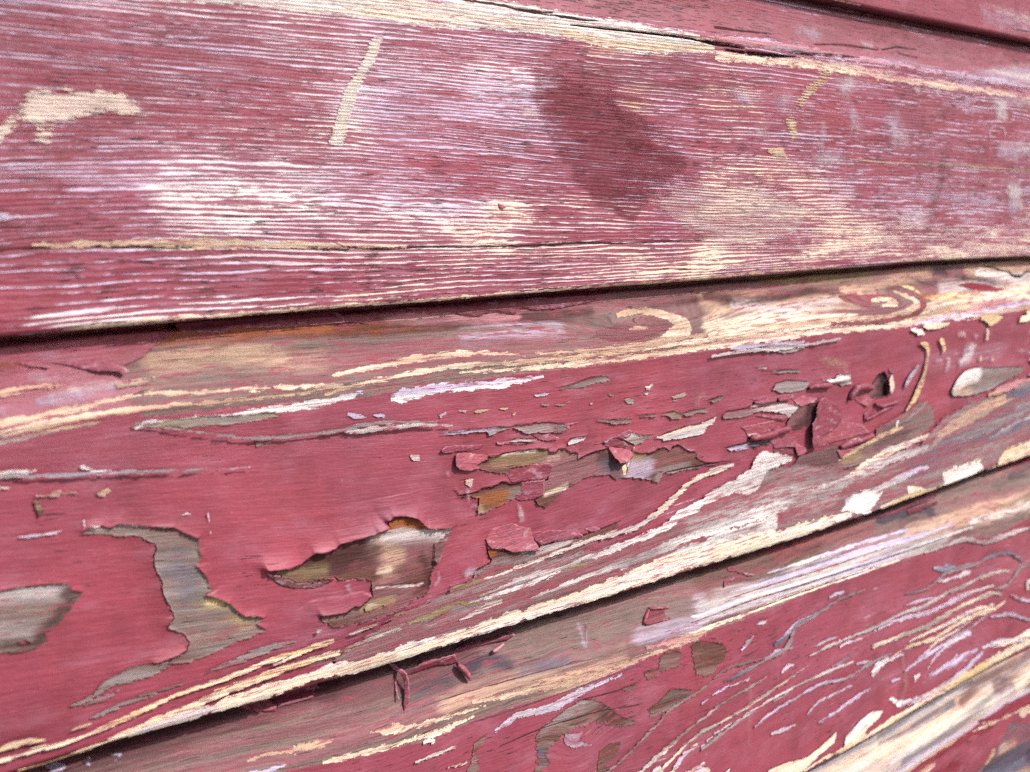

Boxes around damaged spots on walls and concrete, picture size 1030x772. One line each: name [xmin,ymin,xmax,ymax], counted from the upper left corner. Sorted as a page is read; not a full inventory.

crack [464,0,917,59]
peeling [911,322,950,335]
peeling [952,355,1025,396]
peeling [439,367,898,515]
peeling [852,491,939,521]
peeling [267,517,453,627]
peeling [0,583,83,653]
peeling [70,524,266,707]
peeling [642,606,671,626]
peeling [621,640,727,691]
peeling [238,684,319,712]
peeling [768,710,883,772]